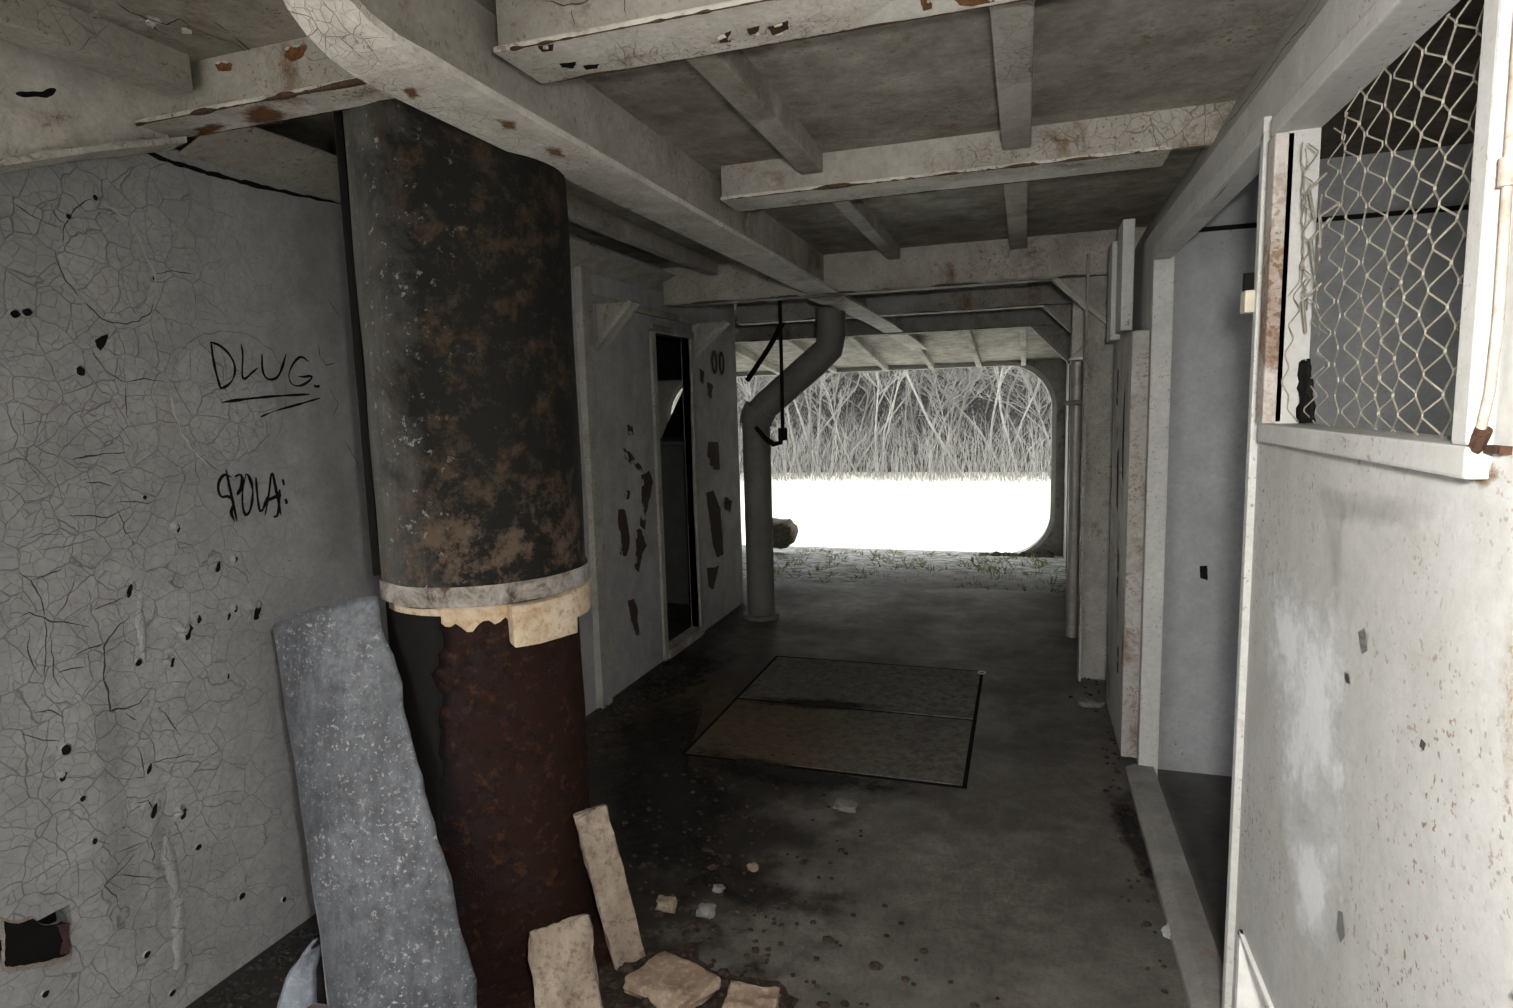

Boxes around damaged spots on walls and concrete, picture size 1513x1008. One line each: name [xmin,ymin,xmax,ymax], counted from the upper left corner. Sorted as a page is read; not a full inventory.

corrosion [558,0,1027,82]
corrosion [135,78,418,138]
crack [145,152,341,204]
crack [11,199,286,902]
peeling [618,424,653,572]
peeling [707,442,720,470]
peeling [706,490,733,589]
peeling [628,598,640,636]
leakage [1268,595,1345,816]
leakage [1289,833,1338,941]